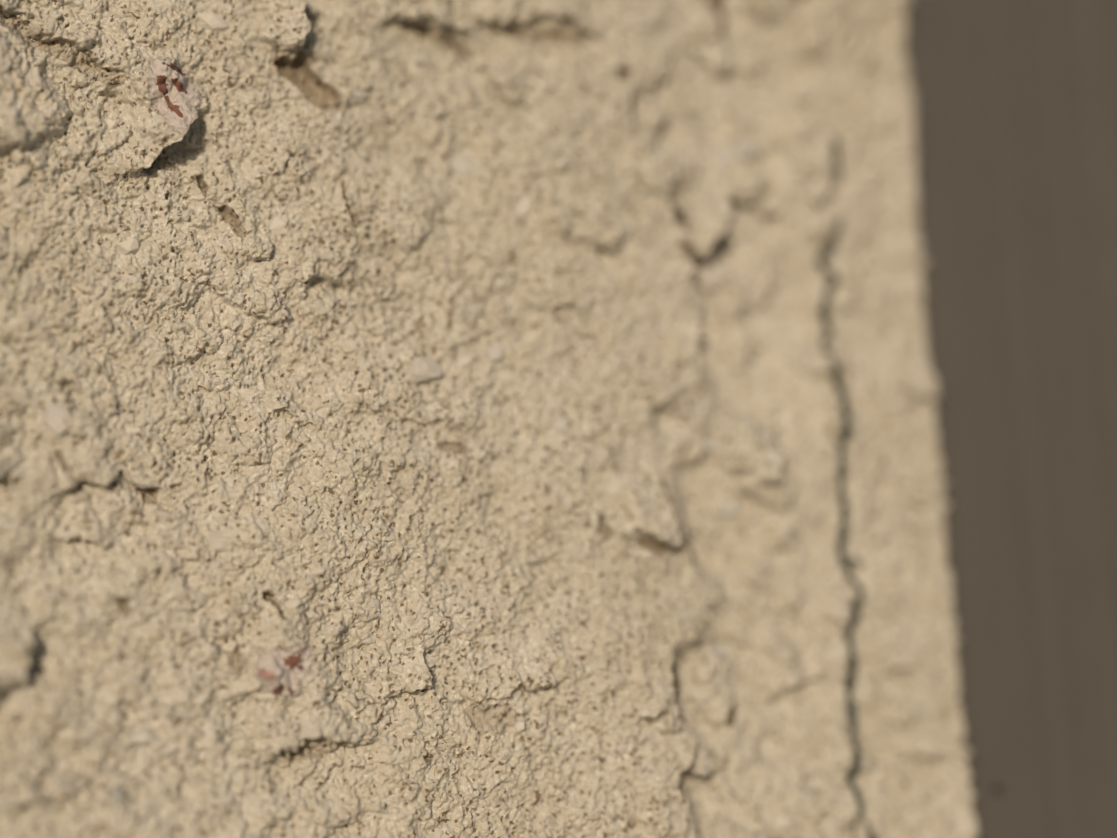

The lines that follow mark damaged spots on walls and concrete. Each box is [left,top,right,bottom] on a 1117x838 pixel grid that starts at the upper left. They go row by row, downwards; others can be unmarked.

crack [833,136,842,187]
crack [816,217,878,838]